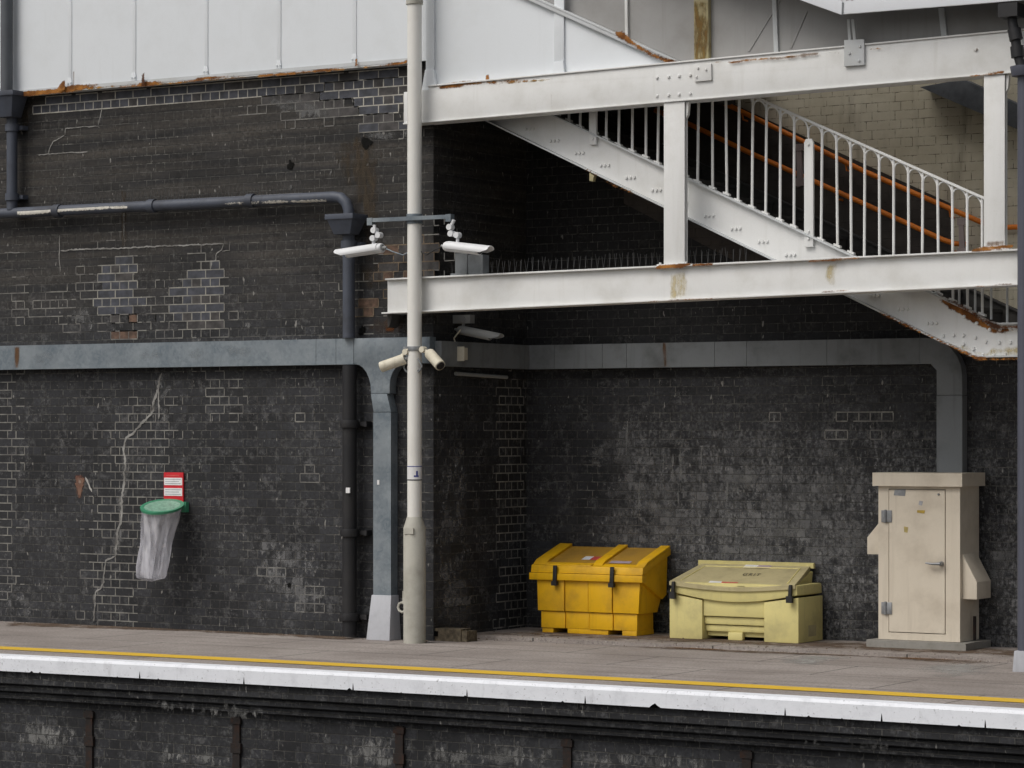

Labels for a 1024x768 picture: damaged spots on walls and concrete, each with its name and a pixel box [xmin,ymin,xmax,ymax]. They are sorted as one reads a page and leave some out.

corrosion [615,32,676,62]
corrosion [694,2,708,60]
corrosion [23,72,233,96]
corrosion [258,59,407,77]
corrosion [942,296,1017,333]
crack [93,373,165,621]